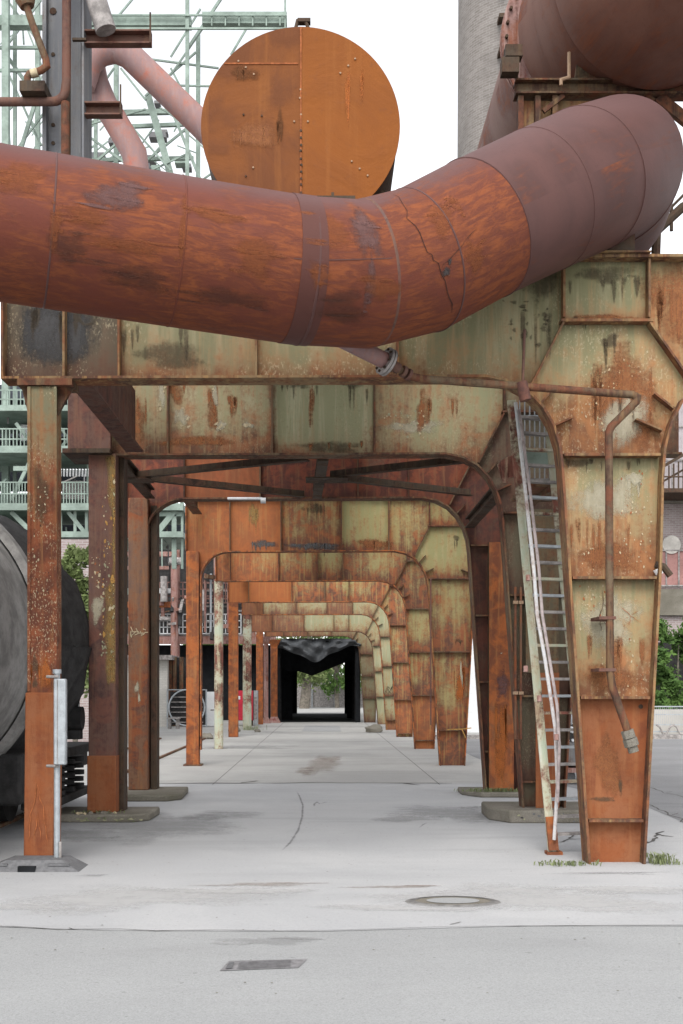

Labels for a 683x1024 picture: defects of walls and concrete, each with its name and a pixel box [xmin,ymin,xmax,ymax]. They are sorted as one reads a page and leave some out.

damp [77,181,149,209]
corrosion [0,143,530,349]
crack [396,195,473,308]
damp [23,307,90,363]
corrosion [161,386,237,445]
corrosion [591,343,655,446]
corrosion [31,655,51,686]